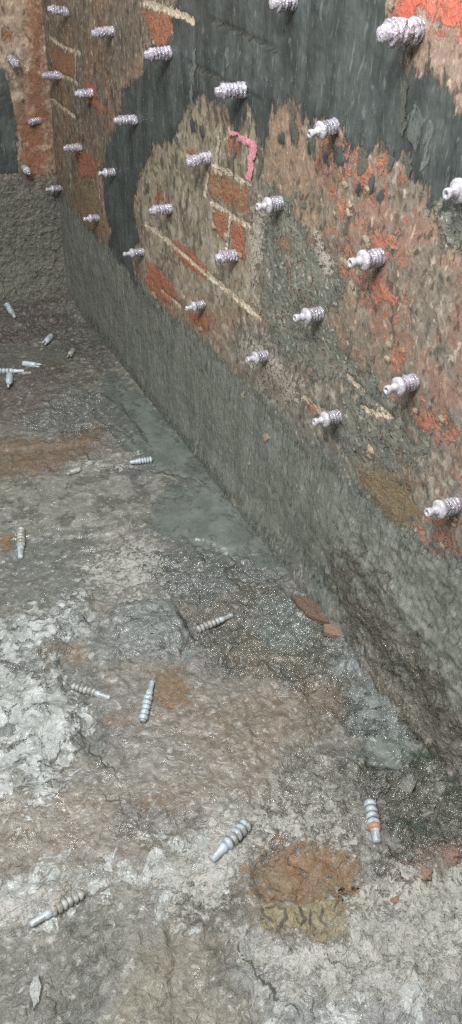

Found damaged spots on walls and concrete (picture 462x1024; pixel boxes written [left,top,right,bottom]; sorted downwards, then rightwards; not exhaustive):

spalling [388,0,462,43]
spalling [50,48,106,114]
spalling [208,168,250,261]
spalling [145,262,178,305]
spalling [171,240,207,279]
spalling [314,135,417,376]
spalling [410,391,460,457]
spalling [408,509,462,558]
corrosion [233,832,366,947]